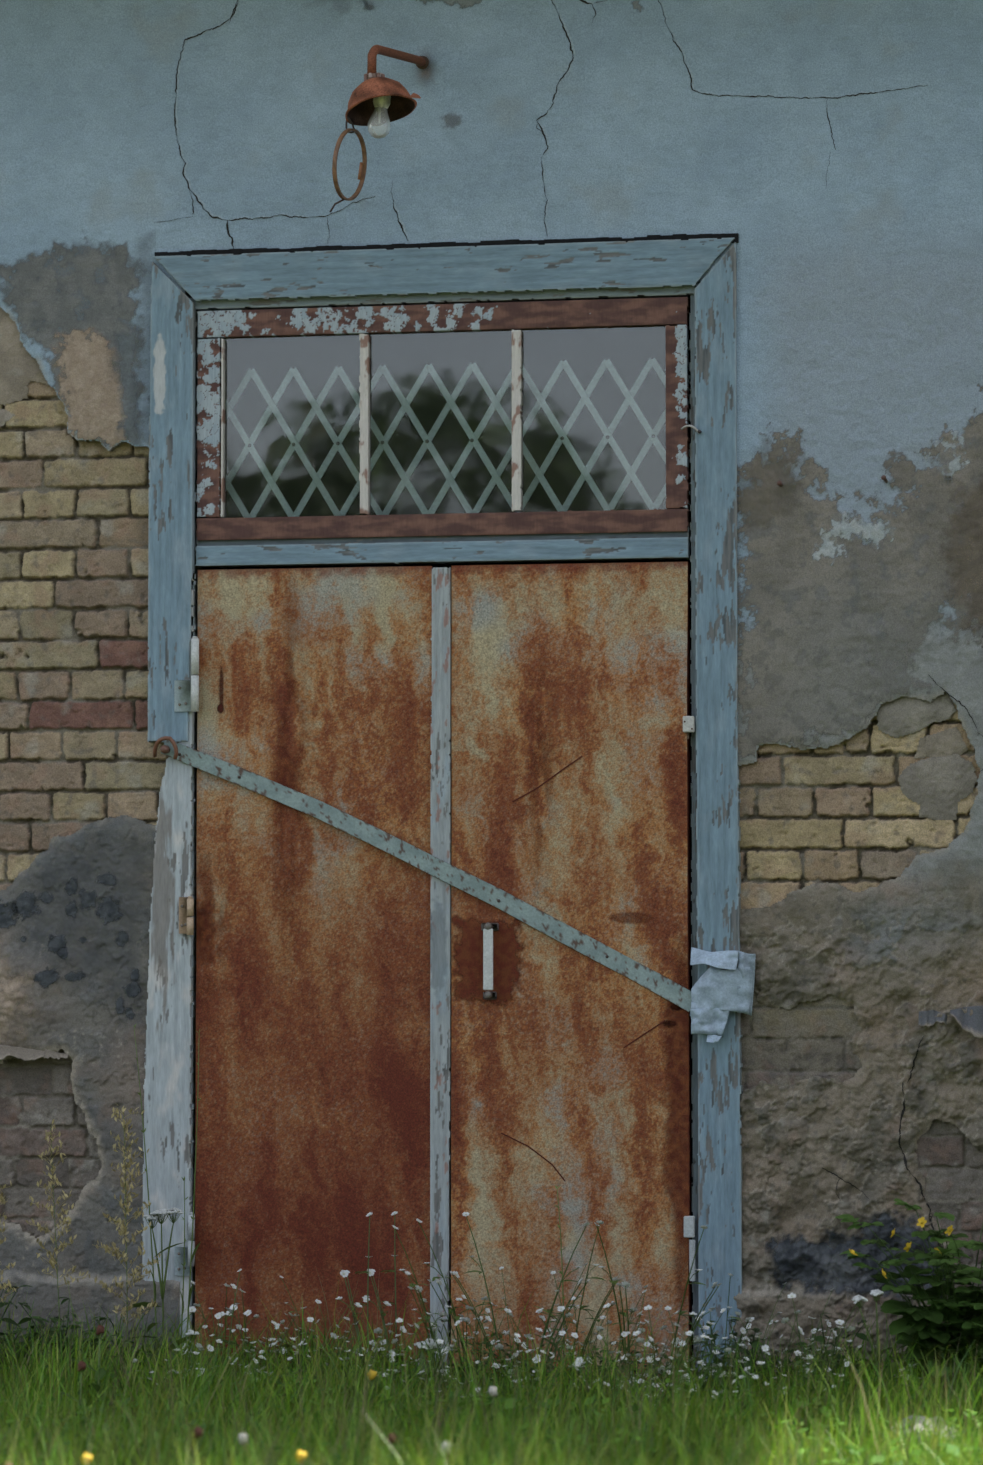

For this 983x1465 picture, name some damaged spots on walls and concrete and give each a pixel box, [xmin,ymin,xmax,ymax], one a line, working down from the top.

crack [161,0,410,249]
peeling [416,0,482,8]
crack [536,0,606,234]
crack [658,0,930,186]
spalling [0,307,168,891]
peeling [737,408,983,909]
corrosion [279,733,297,807]
corrosion [451,915,524,1006]
spalling [0,1045,102,1237]
corrosion [663,1004,690,1290]
crack [898,1036,942,1248]